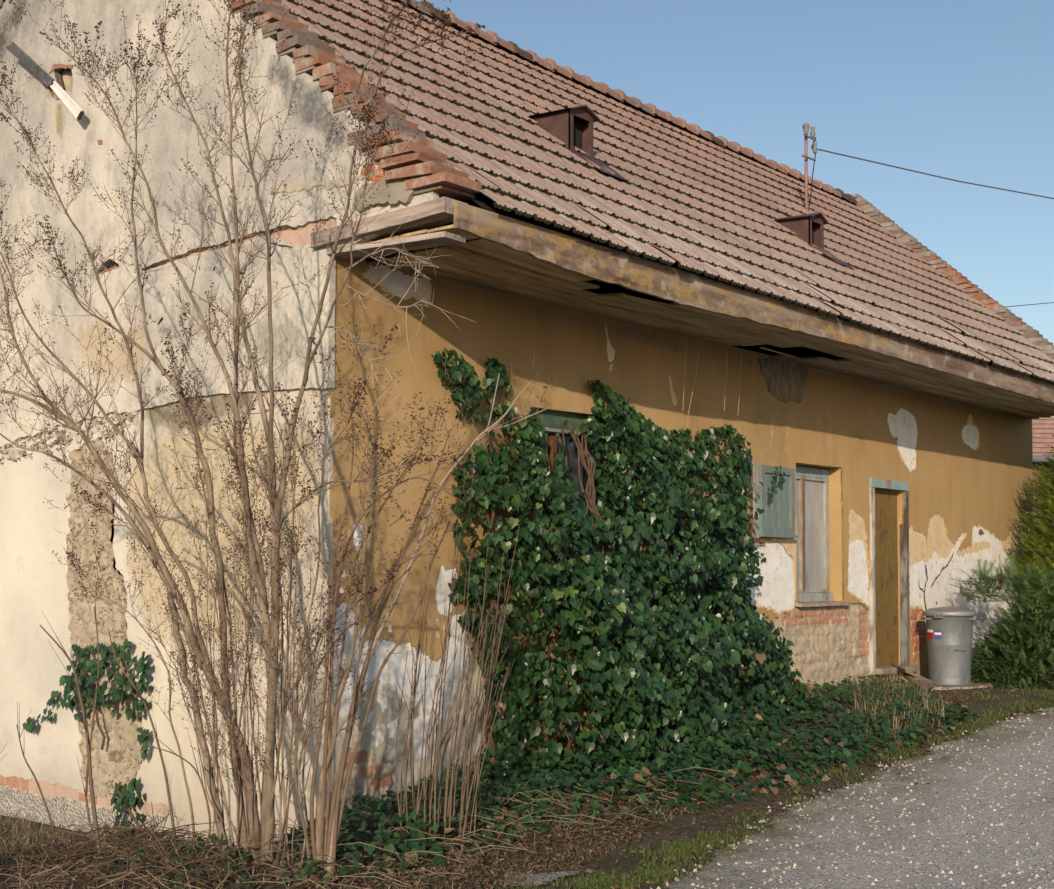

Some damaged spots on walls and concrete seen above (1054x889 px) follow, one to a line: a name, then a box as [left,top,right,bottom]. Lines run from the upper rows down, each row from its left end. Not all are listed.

damp [0,0,25,56]
peeling [362,265,432,307]
peeling [887,408,918,472]
peeling [962,413,980,450]
spalling [0,409,169,845]
peeling [325,564,520,827]
flaking render [736,509,870,687]
peeling [909,514,1029,669]